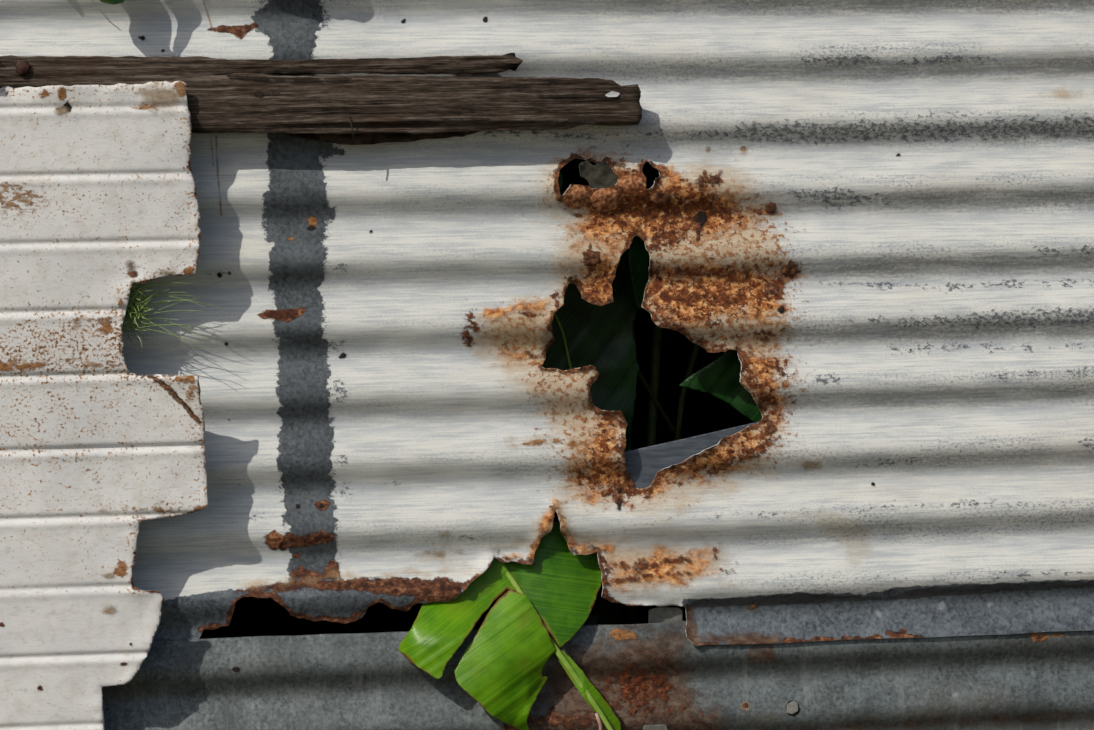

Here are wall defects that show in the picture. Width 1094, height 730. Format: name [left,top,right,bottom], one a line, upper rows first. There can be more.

rust [206,10,259,39]
rust [0,182,44,212]
rust [0,358,120,372]
rust [198,144,820,632]
rust [503,606,923,730]